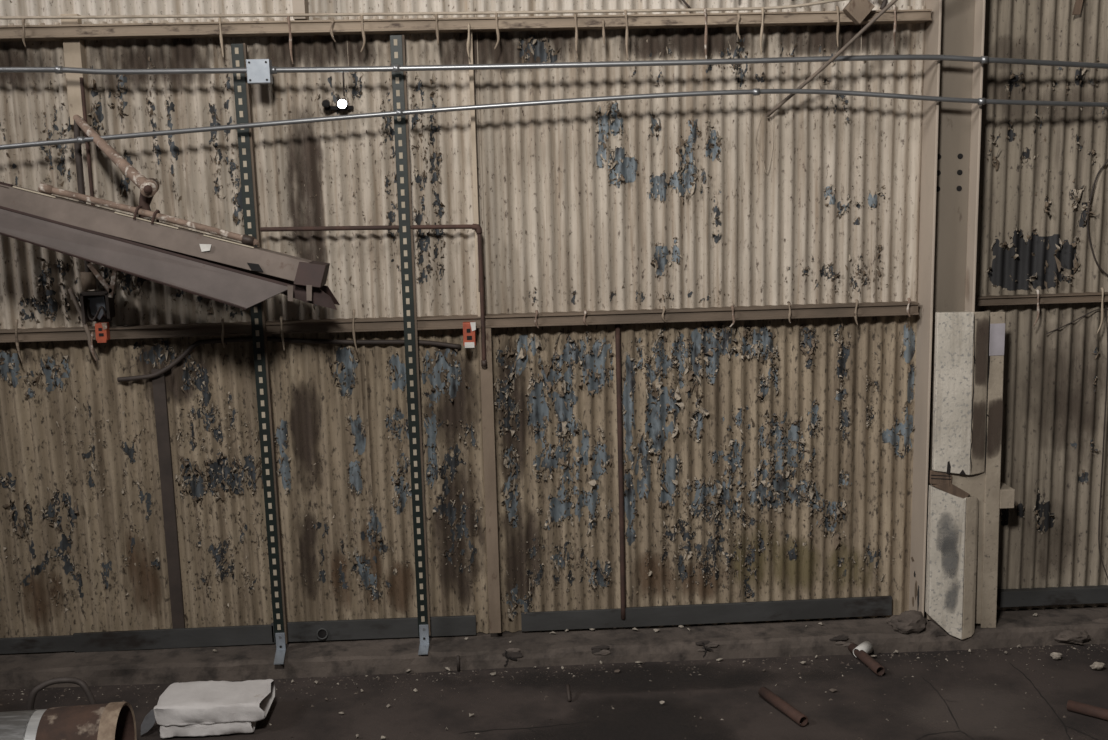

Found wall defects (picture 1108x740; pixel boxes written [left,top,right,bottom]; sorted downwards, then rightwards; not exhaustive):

peeling [19,255,82,326]
peeling [0,349,160,613]
peeling [133,338,268,607]
peeling [271,72,401,293]
peeling [291,345,412,601]
peeling [410,72,445,308]
peeling [420,347,483,588]
peeling [595,101,724,243]
peeling [493,321,895,621]
peeling [771,143,895,299]
peeling [865,321,916,458]
peeling [986,178,1095,293]